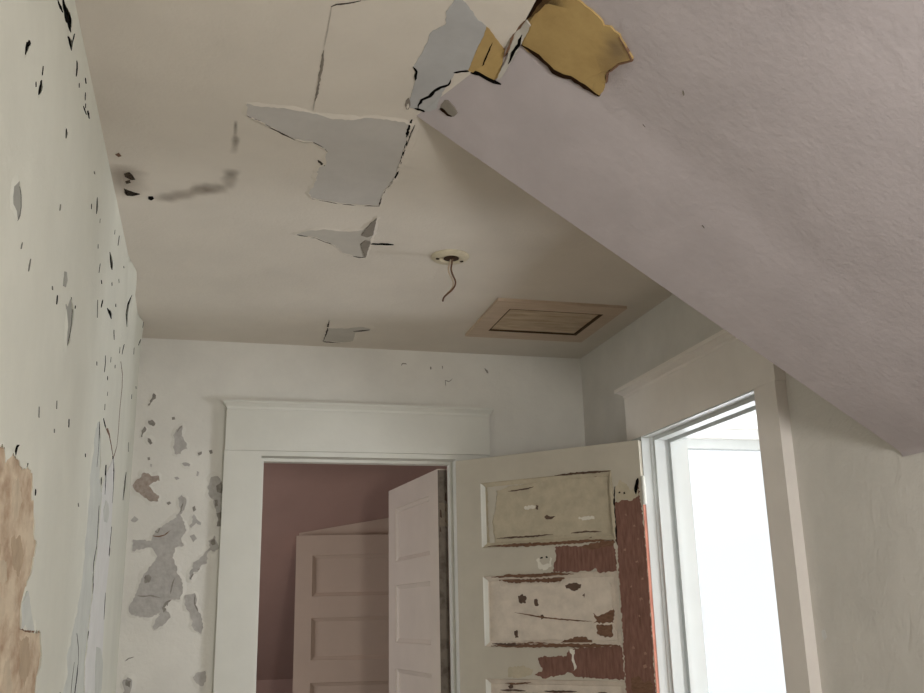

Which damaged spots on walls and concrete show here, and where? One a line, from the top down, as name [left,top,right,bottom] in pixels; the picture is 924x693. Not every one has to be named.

crack [313,0,366,110]
peeling [9,174,22,223]
peeling [52,271,76,354]
flaking render [0,433,42,693]
peeling [60,390,223,693]